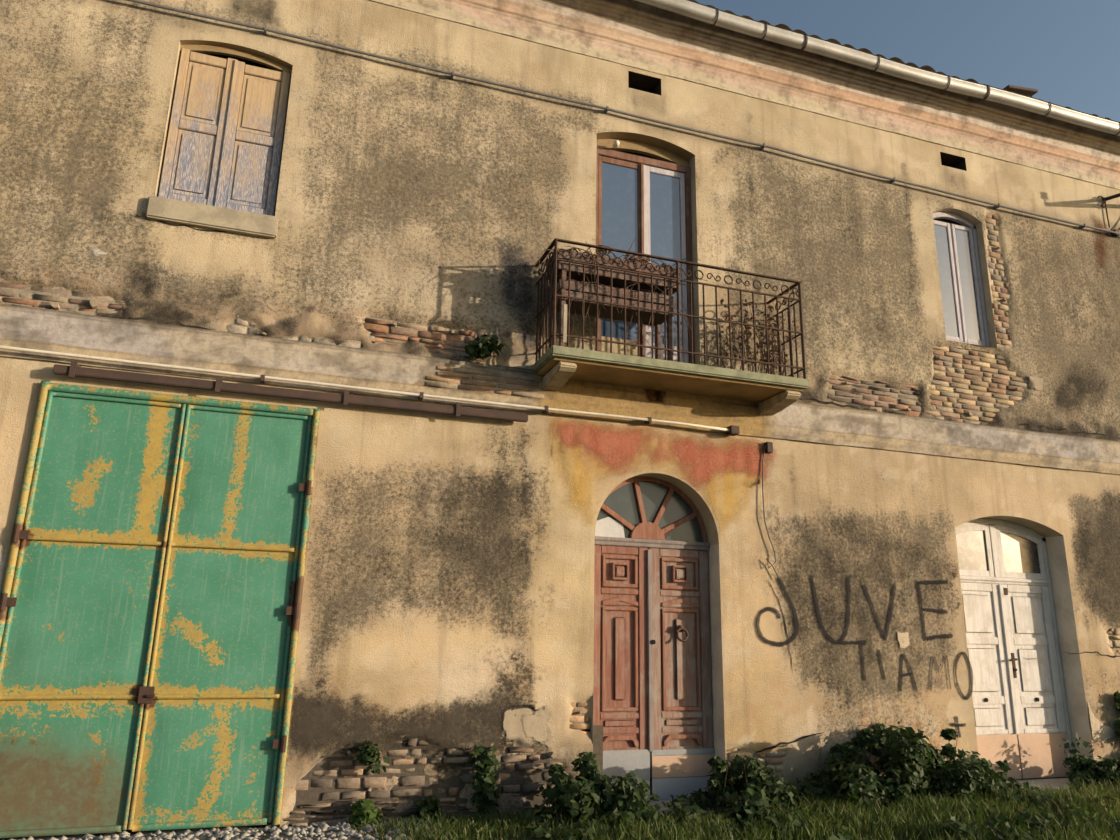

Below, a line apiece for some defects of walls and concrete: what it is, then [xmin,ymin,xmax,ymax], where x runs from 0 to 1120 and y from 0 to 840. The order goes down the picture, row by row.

flaking render [0,275,126,318]
damp [88,263,211,325]
flaking render [226,315,544,399]
flaking render [816,214,1043,425]
peeling [552,419,770,518]
damp [1026,418,1119,441]
damp [426,431,549,639]
damp [761,506,959,690]
crack [1066,644,1120,659]
flaking render [1107,628,1120,653]
damp [290,655,531,774]
flaking render [267,731,574,828]